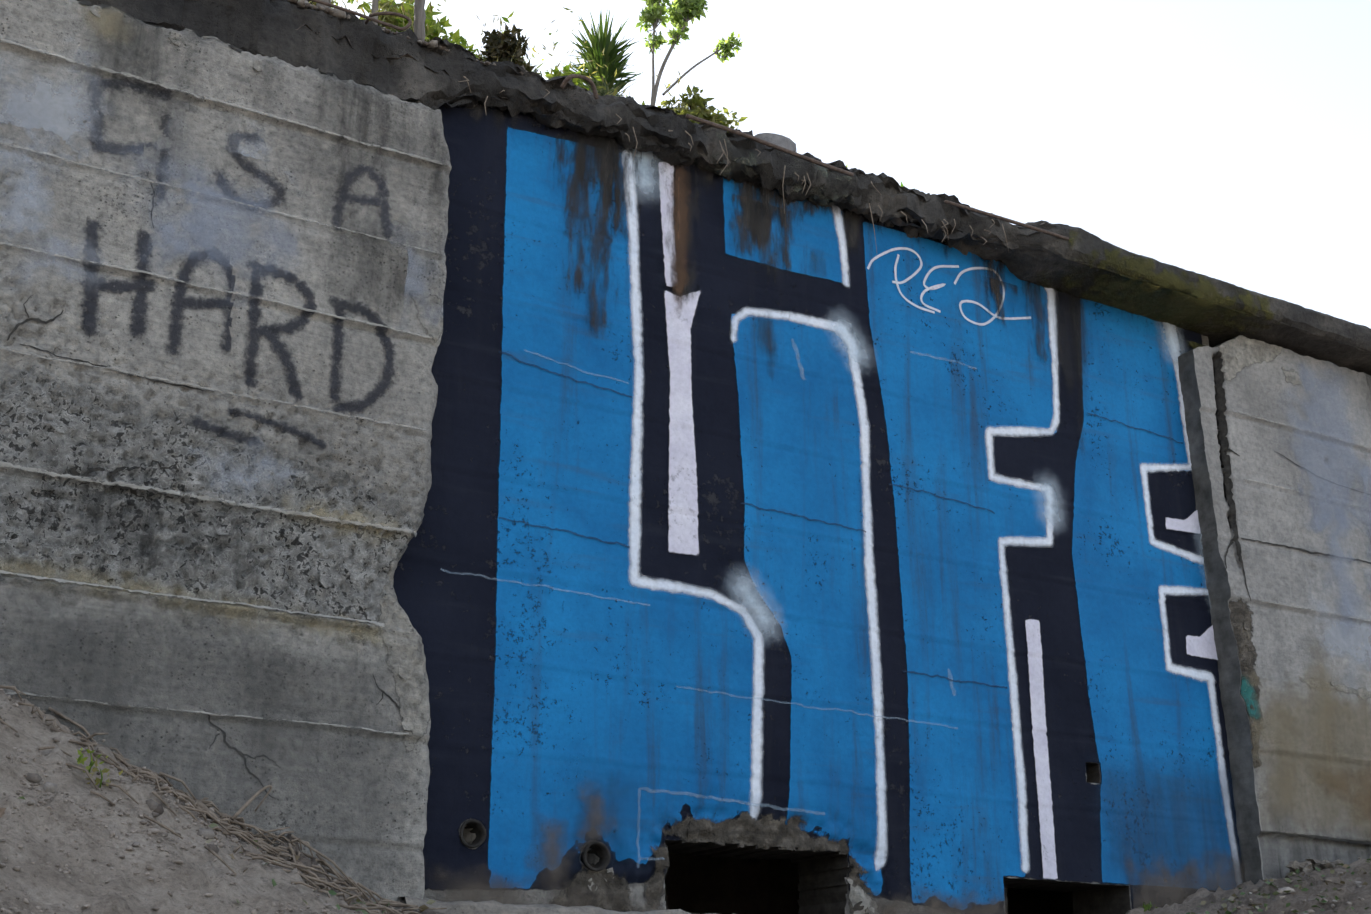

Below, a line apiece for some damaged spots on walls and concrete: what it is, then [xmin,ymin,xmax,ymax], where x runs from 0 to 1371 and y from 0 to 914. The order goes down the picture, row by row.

leakage [559,131,630,331]
leakage [732,179,882,272]
crack [1087,413,1183,444]
crack [1212,351,1371,601]
crack [204,709,280,799]
spalling [552,811,880,914]